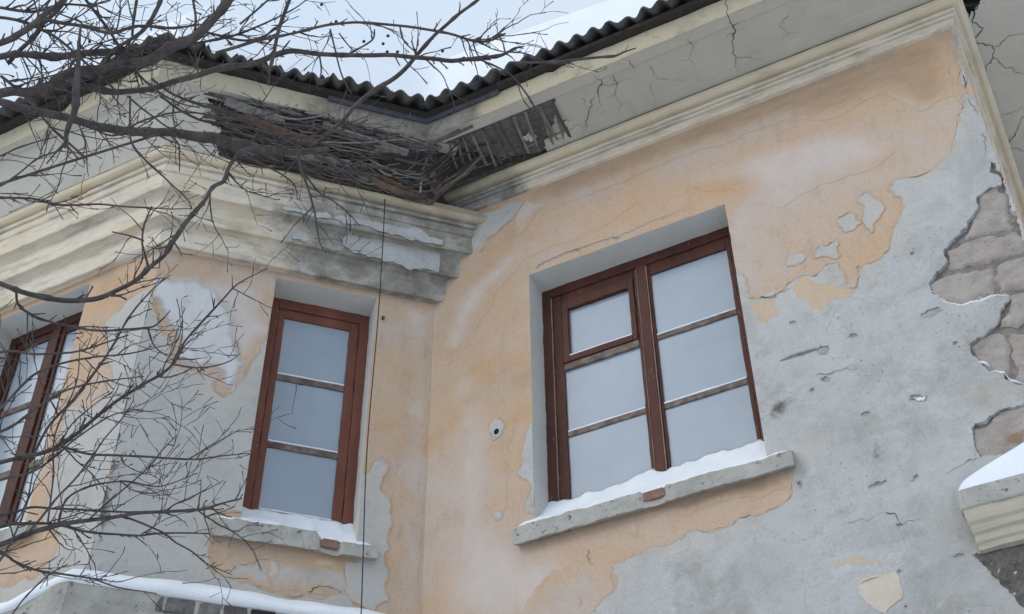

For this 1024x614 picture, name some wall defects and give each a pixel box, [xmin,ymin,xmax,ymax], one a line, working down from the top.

crack [554,42,694,141]
crack [725,0,750,67]
crack [963,2,1023,151]
peeling [283,206,443,273]
peeling [472,199,525,252]
peeling [524,32,1024,614]
peeling [0,279,393,611]
peeling [517,423,534,515]